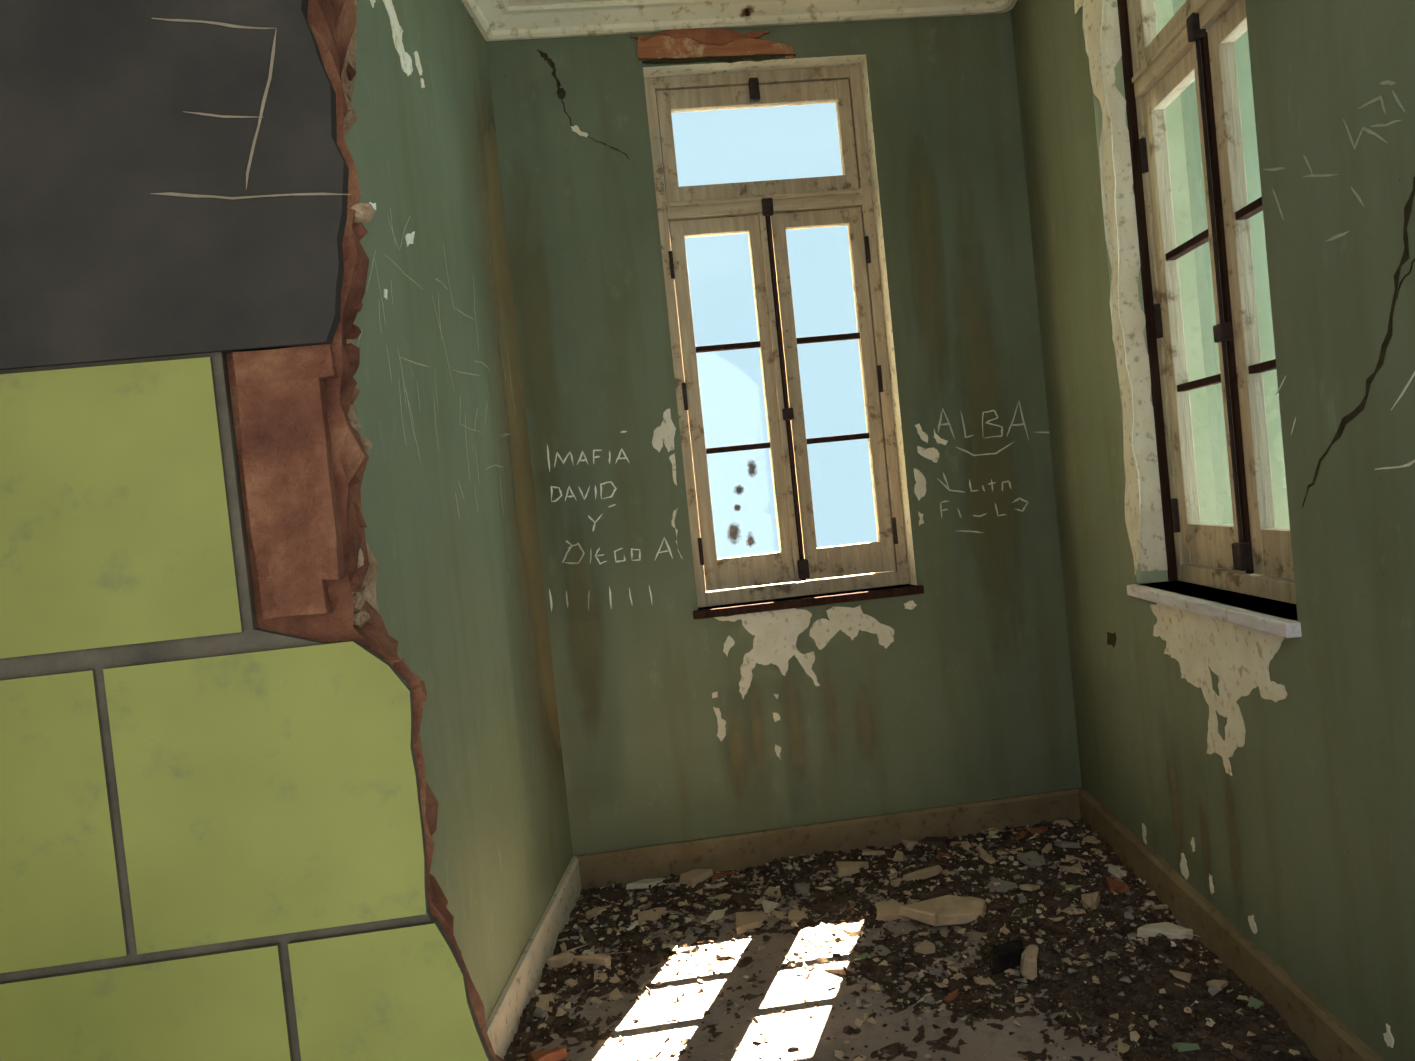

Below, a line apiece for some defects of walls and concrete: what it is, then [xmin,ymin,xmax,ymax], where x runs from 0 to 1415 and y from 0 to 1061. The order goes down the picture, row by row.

peeling [354,0,425,88]
crack [537,50,630,160]
flaking render [351,202,376,241]
peeling [1074,0,1168,575]
crack [1302,176,1415,508]
peeling [712,692,726,741]
peeling [714,605,894,699]
spalling [1107,632,1116,648]
peeling [1150,603,1288,776]